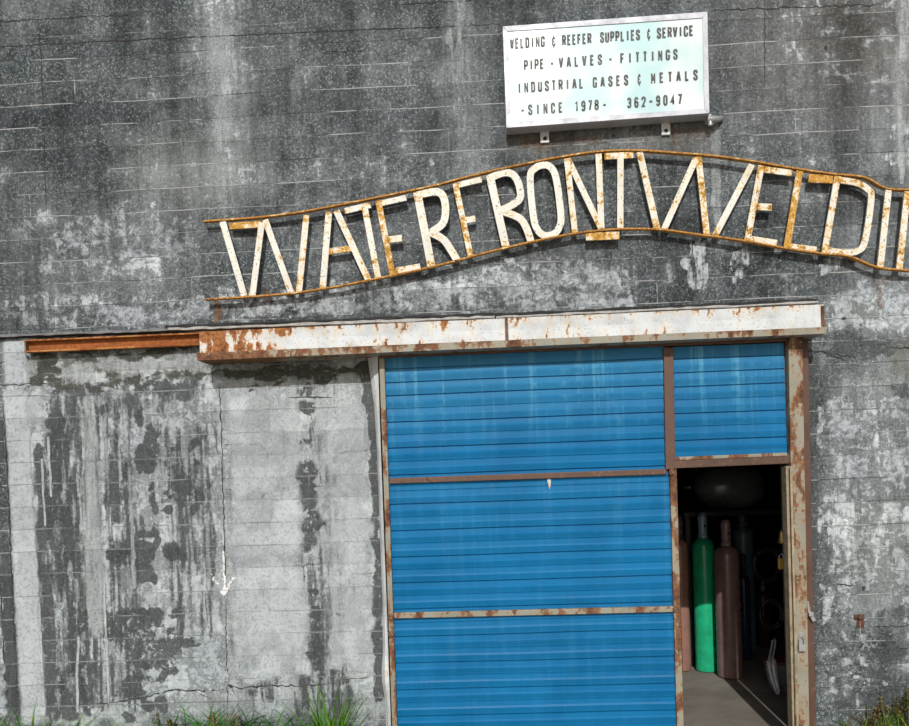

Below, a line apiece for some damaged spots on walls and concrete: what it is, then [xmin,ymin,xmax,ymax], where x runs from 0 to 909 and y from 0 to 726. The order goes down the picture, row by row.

crack [0,0,493,216]
crack [809,350,850,361]
damp [0,341,385,725]
damp [875,605,909,621]